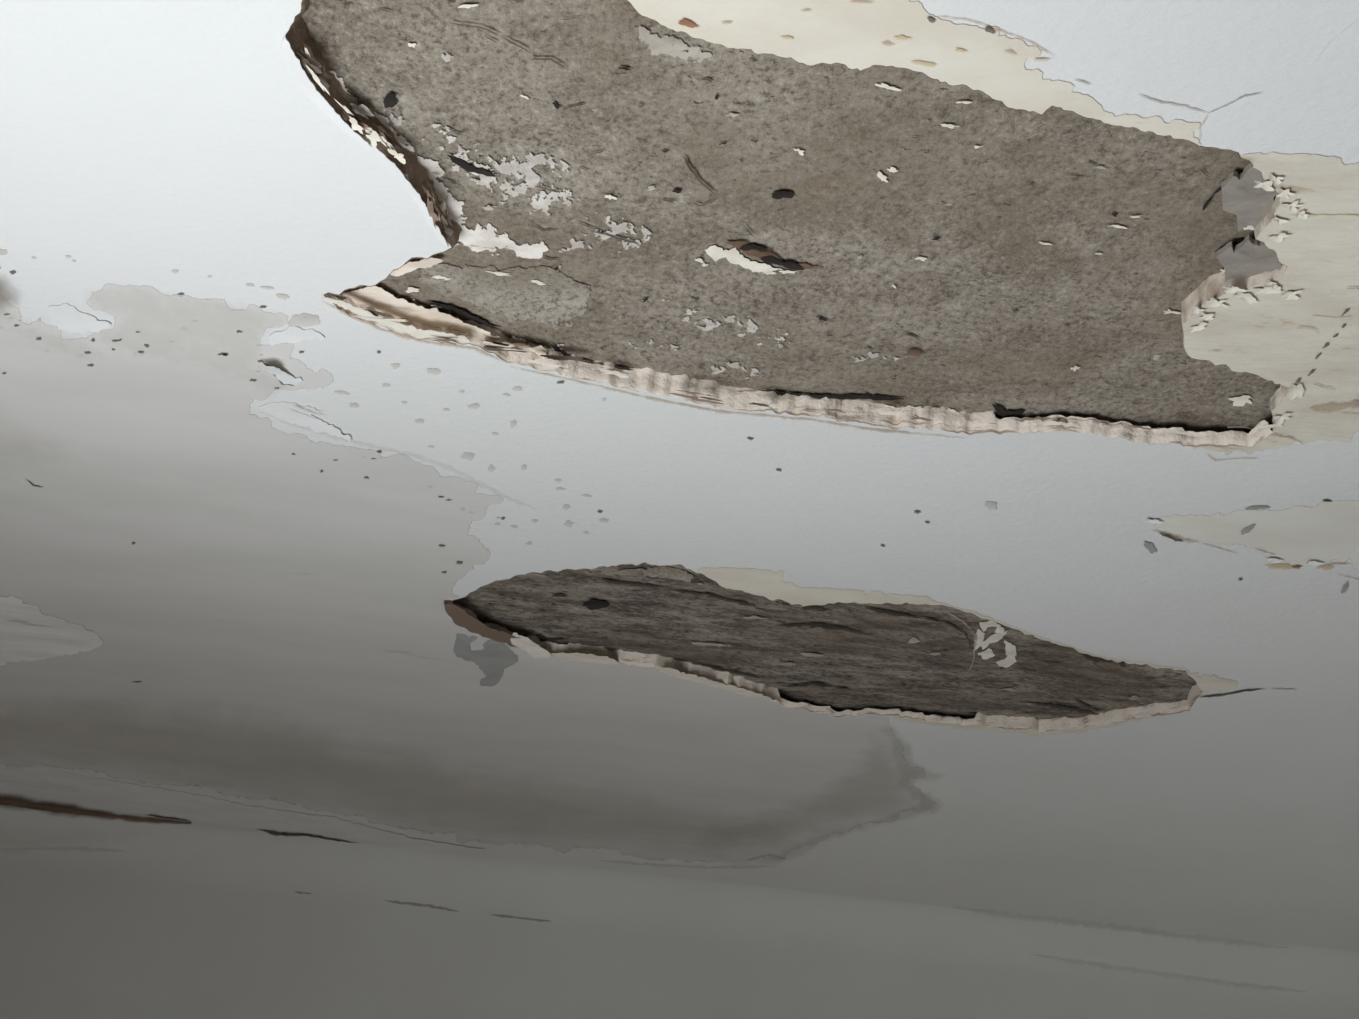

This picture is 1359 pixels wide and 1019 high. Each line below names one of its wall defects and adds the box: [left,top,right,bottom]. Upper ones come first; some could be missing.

flaking render [282,0,1359,461]
peeling [0,284,1295,863]
peeling [1144,500,1359,594]
damp [454,634,518,686]
crack [0,796,192,824]